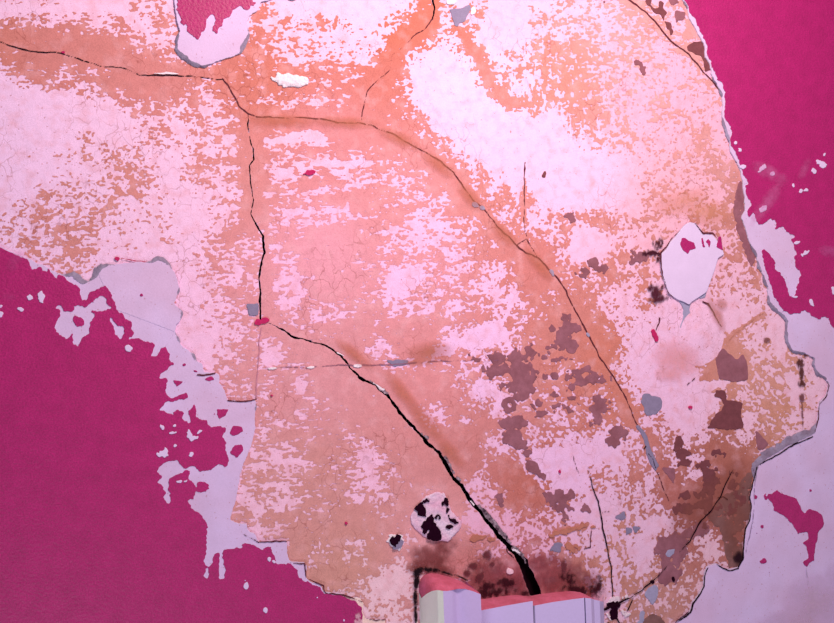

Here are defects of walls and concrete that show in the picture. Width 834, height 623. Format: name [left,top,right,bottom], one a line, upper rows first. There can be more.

crack [629,0,719,90]
crack [5,18,669,501]
leakage [643,238,664,263]
crack [657,224,718,297]
peeling [72,275,103,300]
leakage [648,284,669,304]
peeling [55,296,111,346]
peeling [118,311,174,356]
crack [227,226,537,596]
leakage [413,498,530,623]
leakage [561,562,602,596]
flaking render [617,599,632,623]